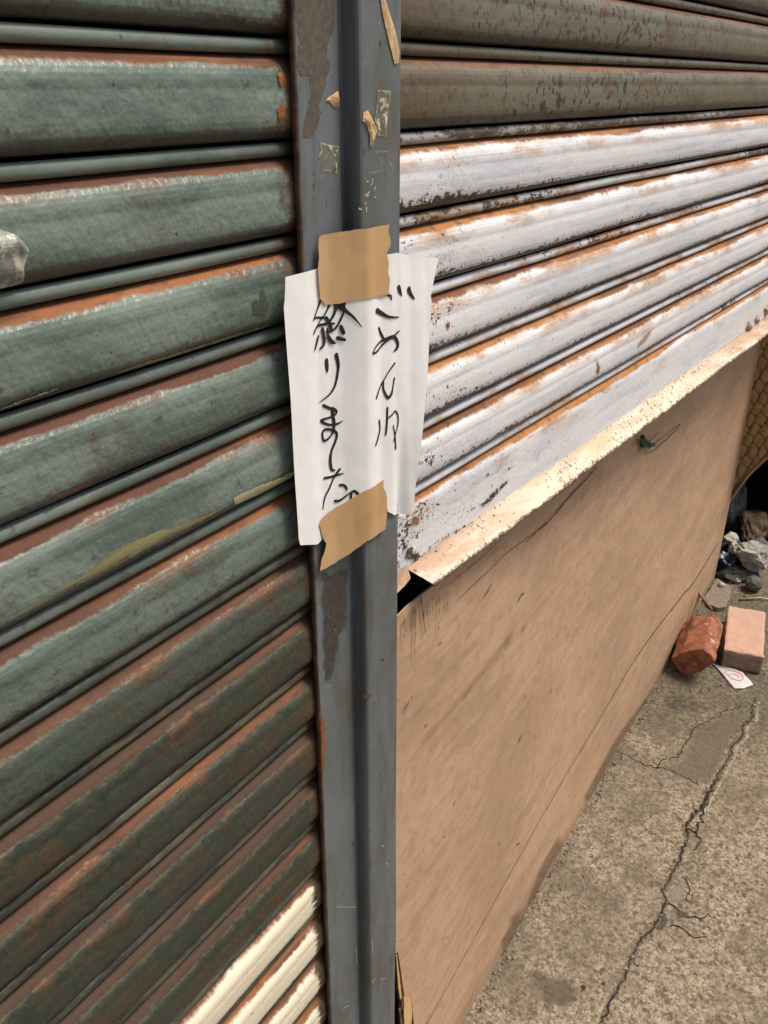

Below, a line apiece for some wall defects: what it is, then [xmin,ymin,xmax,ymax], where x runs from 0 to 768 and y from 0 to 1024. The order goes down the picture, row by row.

peeling [294,0,335,138]
crack [686,794,709,850]
crack [665,877,712,938]